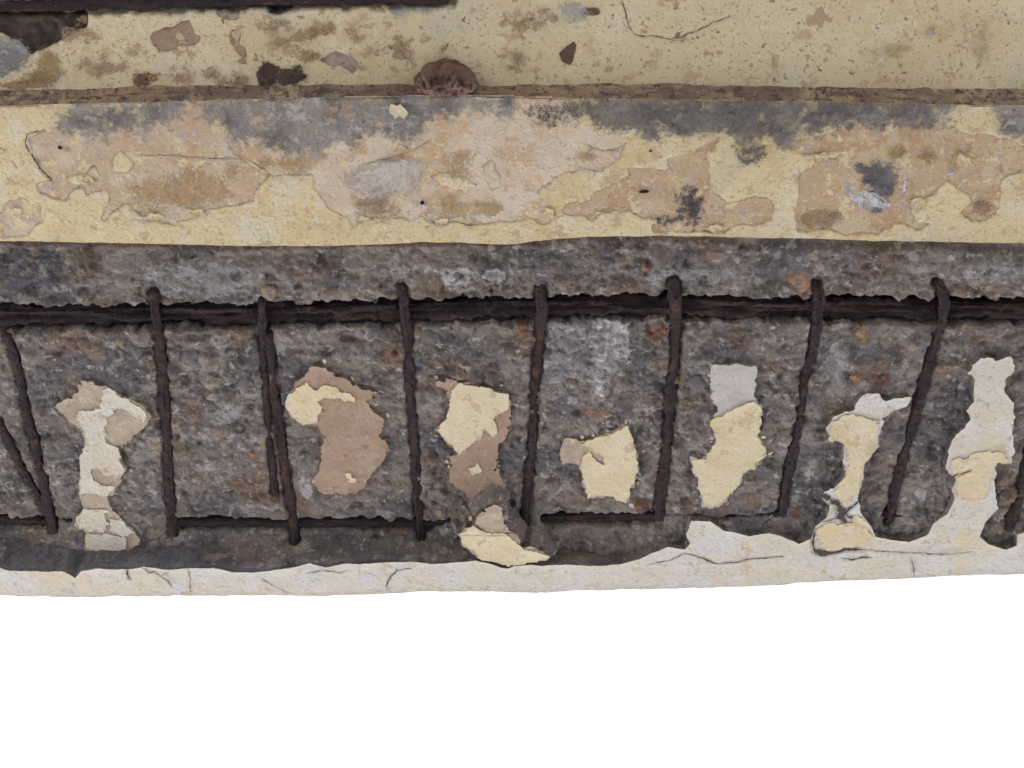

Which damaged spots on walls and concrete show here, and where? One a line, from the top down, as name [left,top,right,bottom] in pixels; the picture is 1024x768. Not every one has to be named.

peeling [500,9,557,32]
peeling [582,7,600,16]
crack [622,1,732,42]
spalling [0,0,450,88]
peeling [559,42,576,65]
water stain [55,59,957,168]
water stain [993,105,1024,139]
spalling [0,95,1024,569]